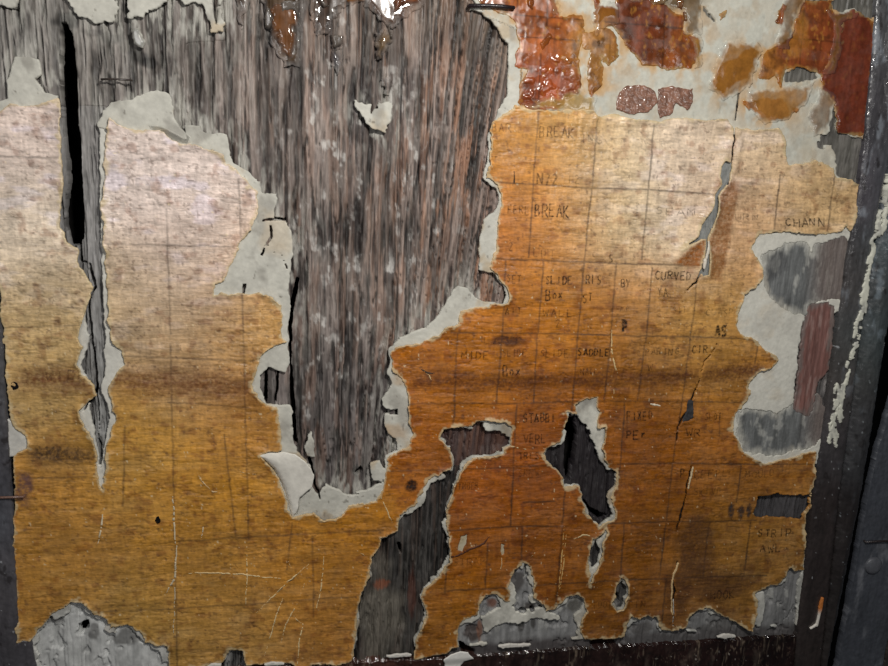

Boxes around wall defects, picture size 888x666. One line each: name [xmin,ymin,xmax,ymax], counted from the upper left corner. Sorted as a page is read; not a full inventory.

crack [687,95,738,290]
peeling [0,0,874,521]
crack [676,381,699,439]
peeling [353,421,512,660]
peeling [544,397,616,582]
crack [676,466,694,528]
peeling [32,602,169,666]
peeling [434,563,591,657]
crack [671,562,679,616]
peeling [612,558,805,645]